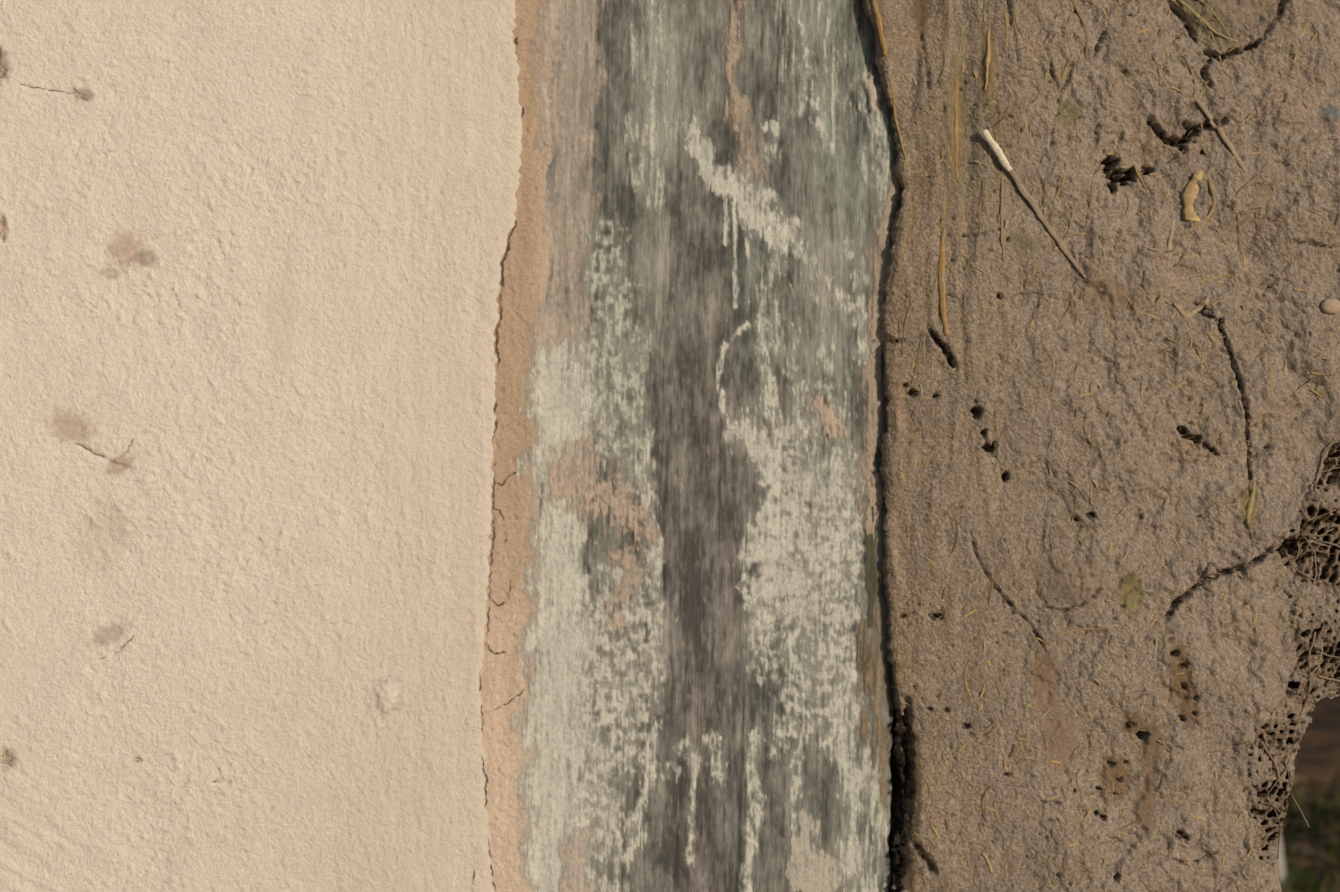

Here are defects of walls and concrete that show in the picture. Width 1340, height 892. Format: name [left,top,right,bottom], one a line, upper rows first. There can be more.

peeling [717,0,767,181]
peeling [863,75,881,112]
crack [1147,120,1217,154]
crack [1172,2,1283,84]
peeling [811,171,901,541]
crack [1197,311,1263,503]
peeling [547,421,660,636]
crack [1163,533,1284,618]
crack [892,701,933,892]